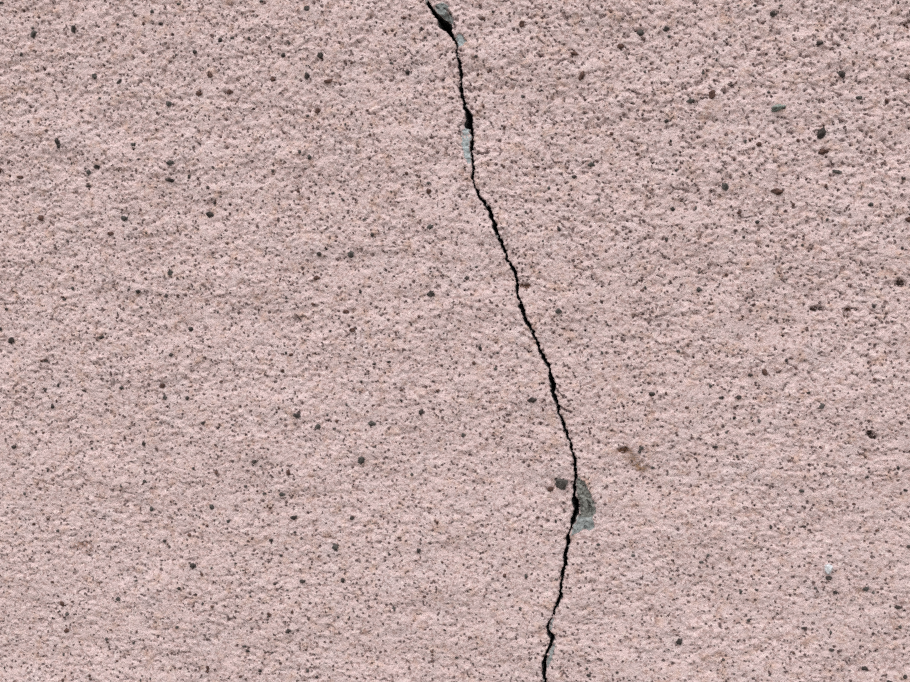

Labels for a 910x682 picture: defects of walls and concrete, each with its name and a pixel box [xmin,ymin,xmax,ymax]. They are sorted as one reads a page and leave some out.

crack [425,0,580,682]